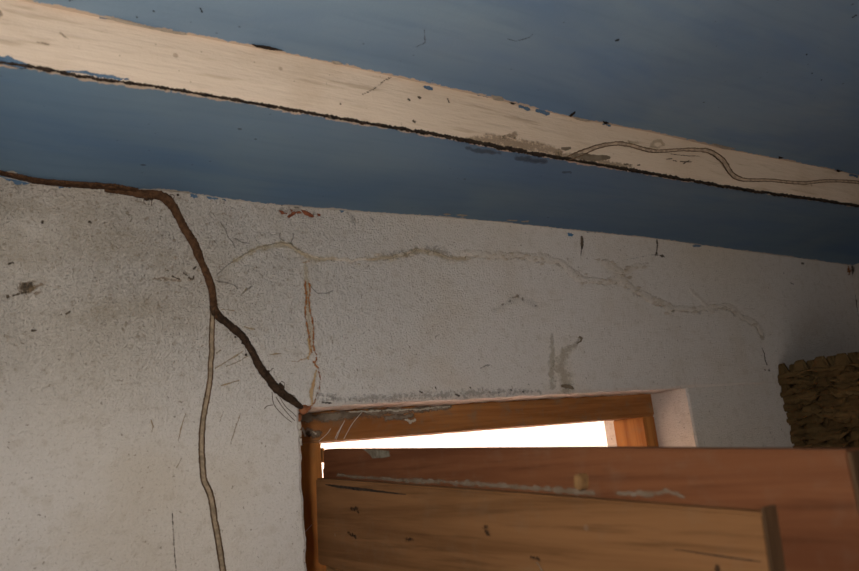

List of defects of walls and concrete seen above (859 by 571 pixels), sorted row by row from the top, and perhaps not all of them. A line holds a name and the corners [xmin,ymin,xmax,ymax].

crack [0,61,859,207]
crack [0,170,303,571]